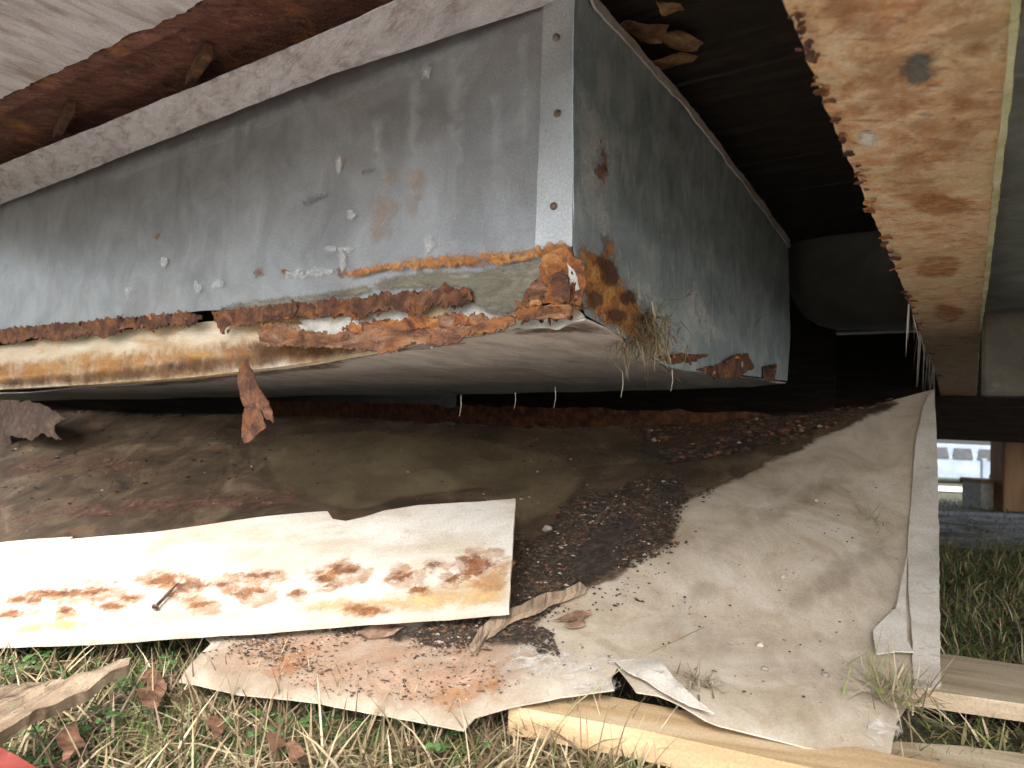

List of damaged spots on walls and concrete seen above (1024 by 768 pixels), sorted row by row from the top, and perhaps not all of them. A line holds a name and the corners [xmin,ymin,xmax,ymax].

rust [0,235,666,444]